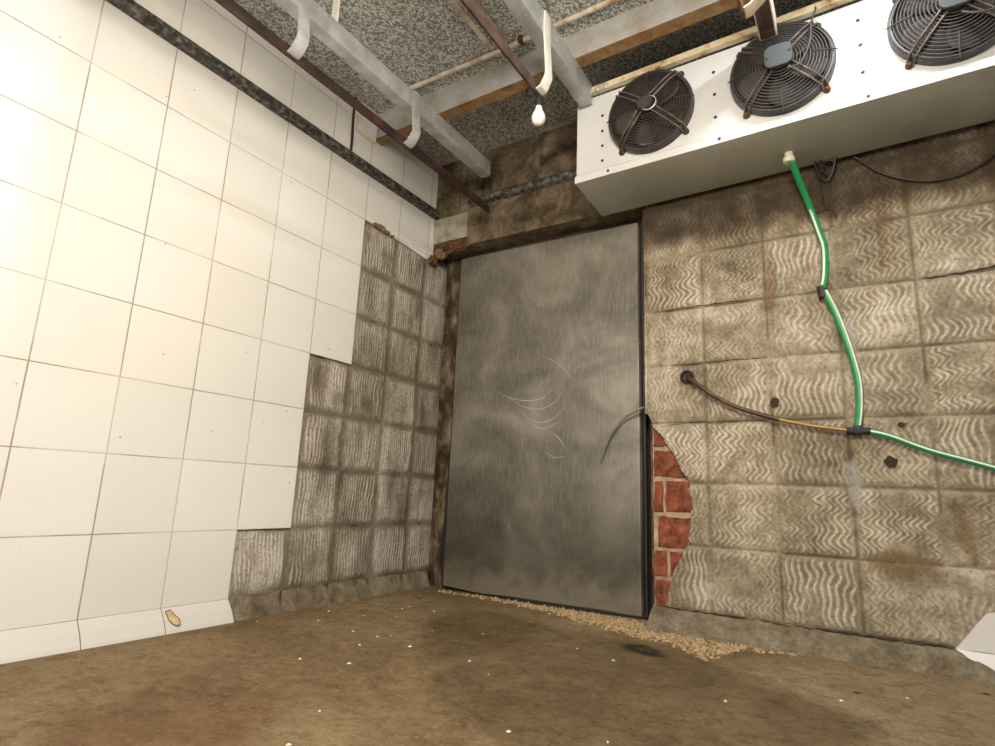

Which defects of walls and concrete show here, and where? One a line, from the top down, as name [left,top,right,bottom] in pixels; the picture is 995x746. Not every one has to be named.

peeling [229,221,471,597]
peeling [643,129,995,648]
leakage [625,644,662,657]